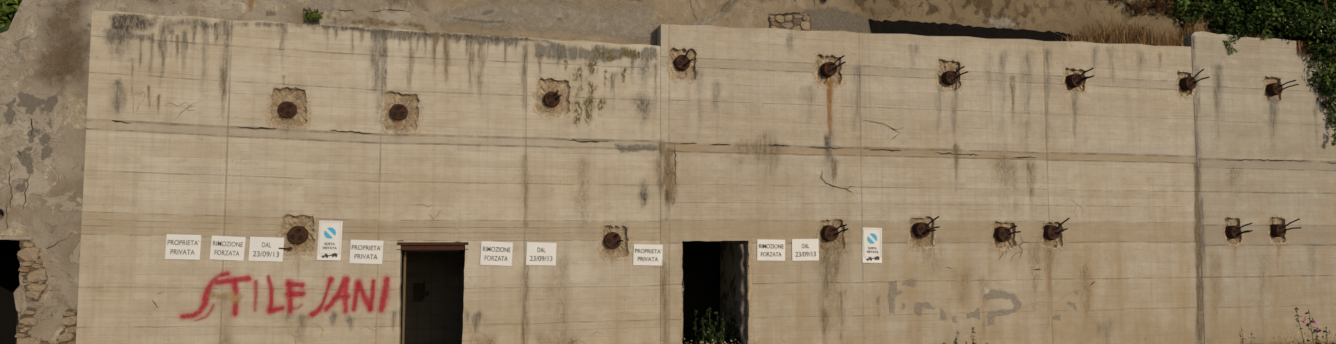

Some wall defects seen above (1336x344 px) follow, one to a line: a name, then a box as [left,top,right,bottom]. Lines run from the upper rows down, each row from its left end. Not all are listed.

damp [107,14,657,123]
flaking render [4,92,58,192]